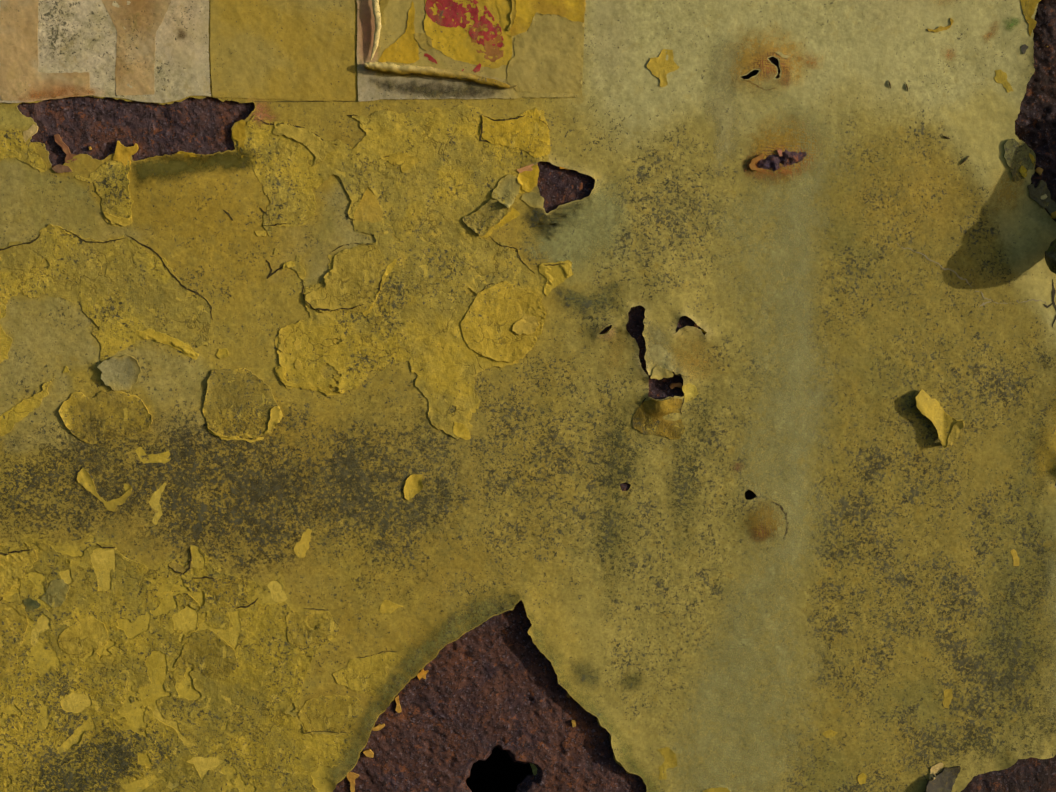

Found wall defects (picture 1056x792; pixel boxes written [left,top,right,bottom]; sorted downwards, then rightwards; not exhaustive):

rust [734,38,815,85]
rust [17,90,271,173]
rust [1015,0,1056,222]
rust [517,161,595,213]
crack [0,228,213,320]
peeling [203,104,573,442]
peeling [58,355,152,444]
peeling [632,383,698,439]
peeling [77,468,133,512]
peeling [404,474,423,500]
peeling [0,542,403,792]
rust [333,600,646,792]